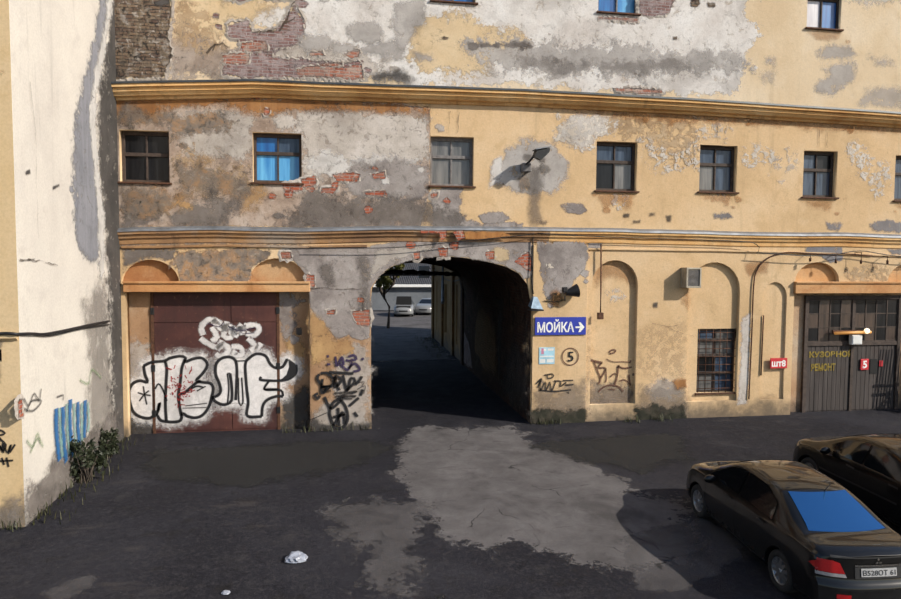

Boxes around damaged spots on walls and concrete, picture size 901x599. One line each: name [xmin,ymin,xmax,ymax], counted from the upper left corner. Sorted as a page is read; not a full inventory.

damp [0,0,302,528]
flaking render [168,98,602,426]
peeling [70,0,764,264]
flaking render [816,44,857,95]
peeling [846,141,892,198]
flaking render [860,89,901,107]